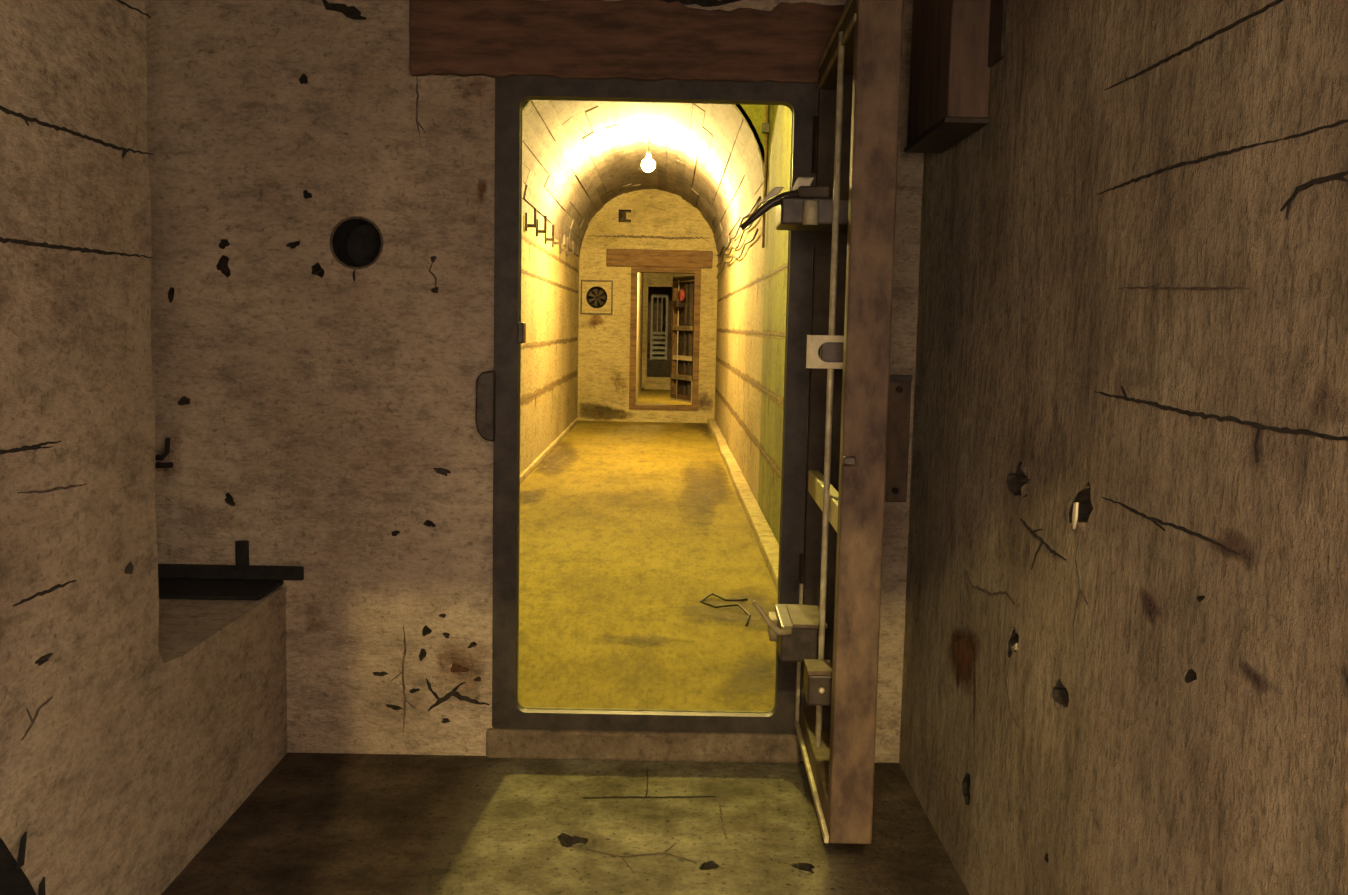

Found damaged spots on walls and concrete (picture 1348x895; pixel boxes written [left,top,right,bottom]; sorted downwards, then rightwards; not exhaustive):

crack [1104,0,1283,90]
crack [0,105,153,155]
crack [1097,120,1348,195]
crack [1280,171,1348,219]
crack [0,237,153,258]
crack [0,441,61,455]
crack [1094,386,1348,463]
spalling [1005,462,1030,497]
spalling [1067,481,1093,531]
crack [1101,497,1240,555]
crack [390,625,490,733]
spalling [1051,678,1069,711]